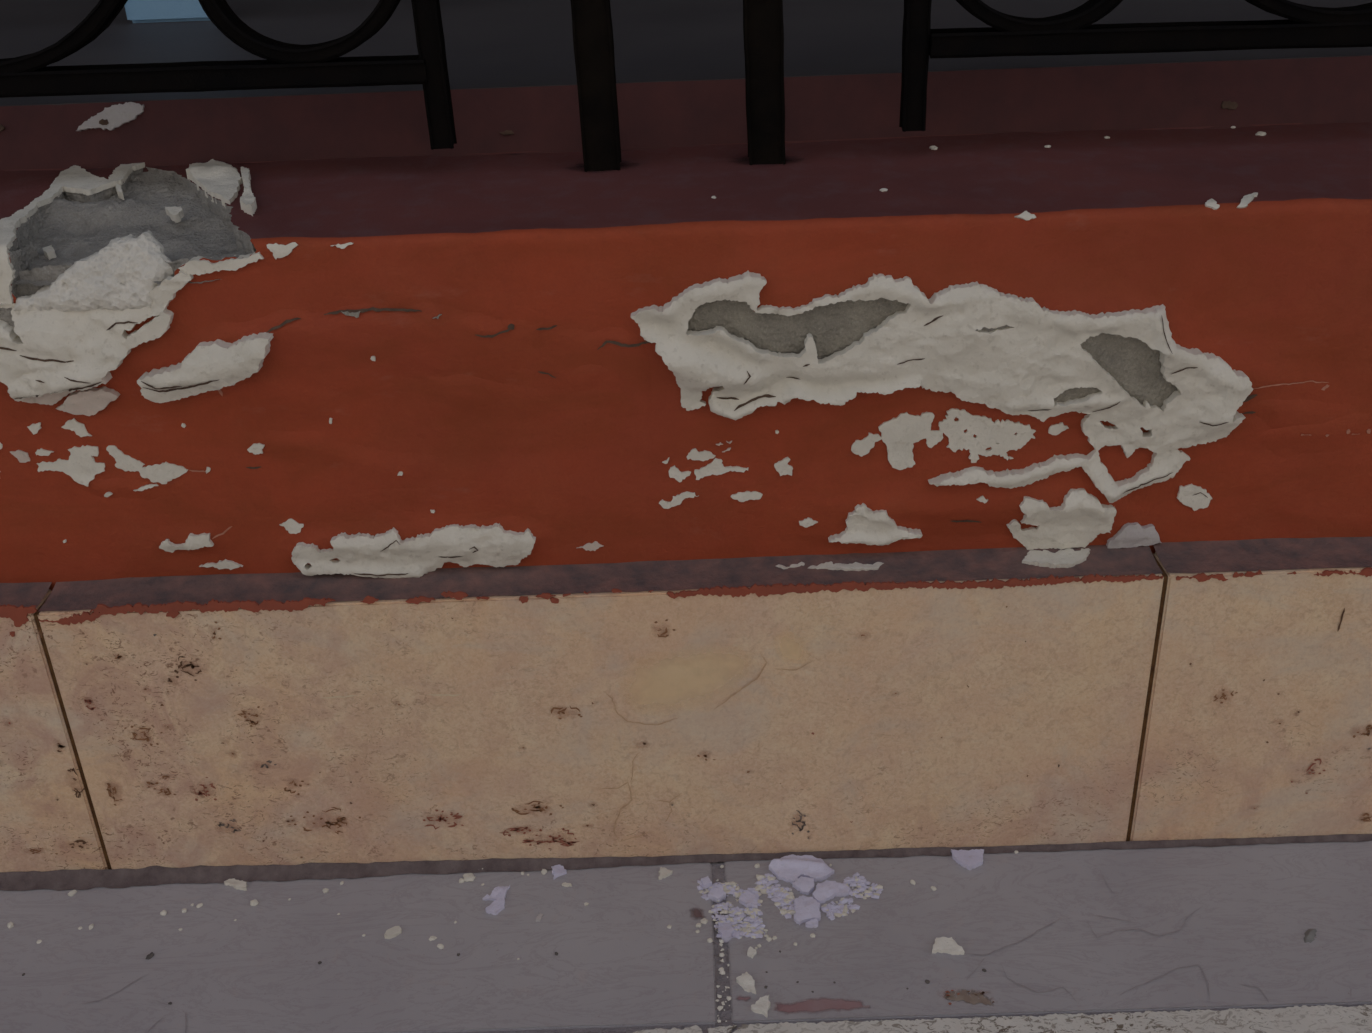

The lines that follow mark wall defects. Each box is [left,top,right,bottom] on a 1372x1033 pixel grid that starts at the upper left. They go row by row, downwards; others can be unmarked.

spalling [0,159,298,491]
peeling [279,510,536,578]
peeling [776,503,923,571]
spalling [631,271,1253,550]